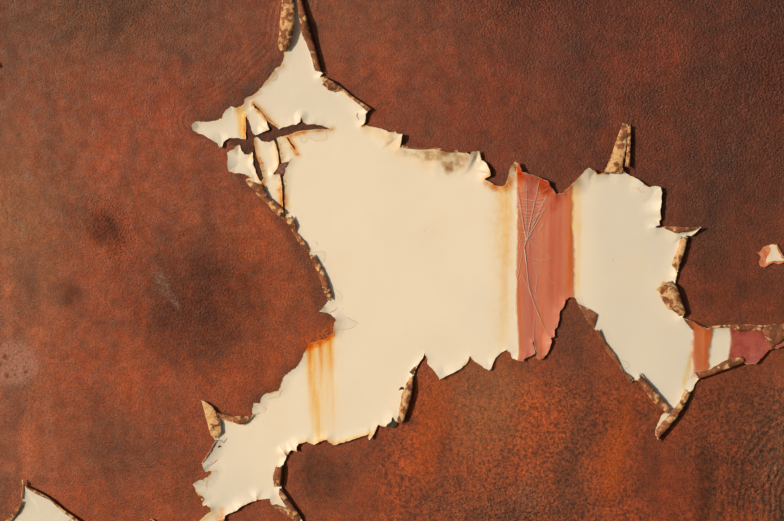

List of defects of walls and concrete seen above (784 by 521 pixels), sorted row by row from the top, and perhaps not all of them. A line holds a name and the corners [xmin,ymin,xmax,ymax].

peeling [192,0,784,521]
corrosion [516,163,574,362]
corrosion [692,322,712,373]
corrosion [728,326,784,364]
peeling [5,479,80,521]